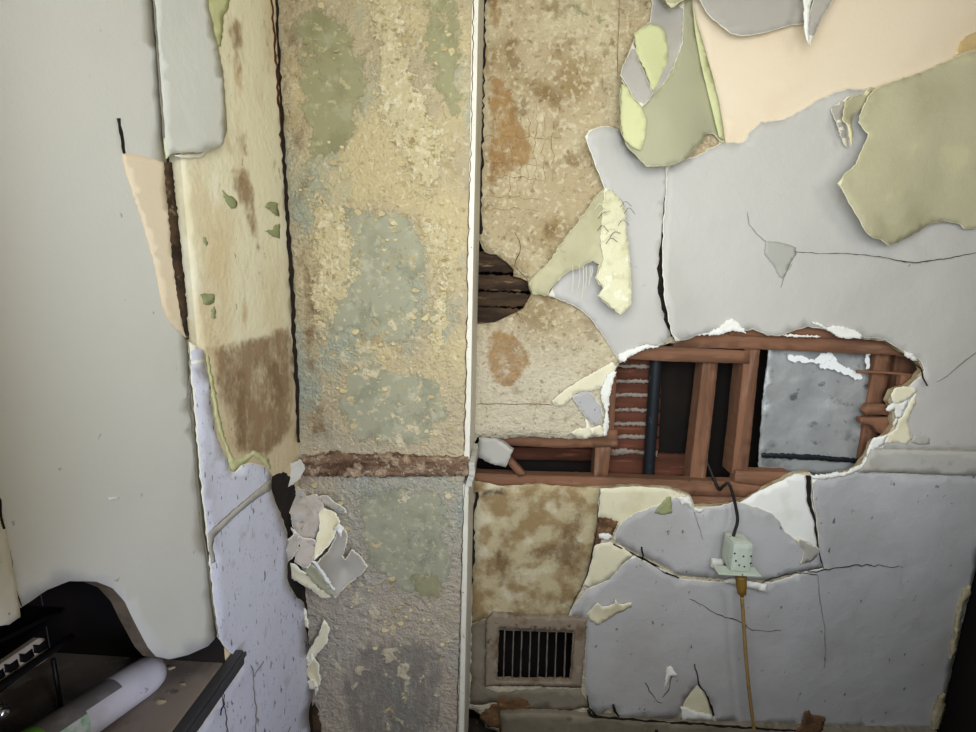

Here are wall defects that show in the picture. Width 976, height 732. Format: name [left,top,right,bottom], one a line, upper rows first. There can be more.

peeling [155,0,230,159]
crack [781,252,973,286]
damp [216,331,291,454]
peeling [469,0,976,732]
peeling [188,342,395,732]
crack [762,475,903,667]